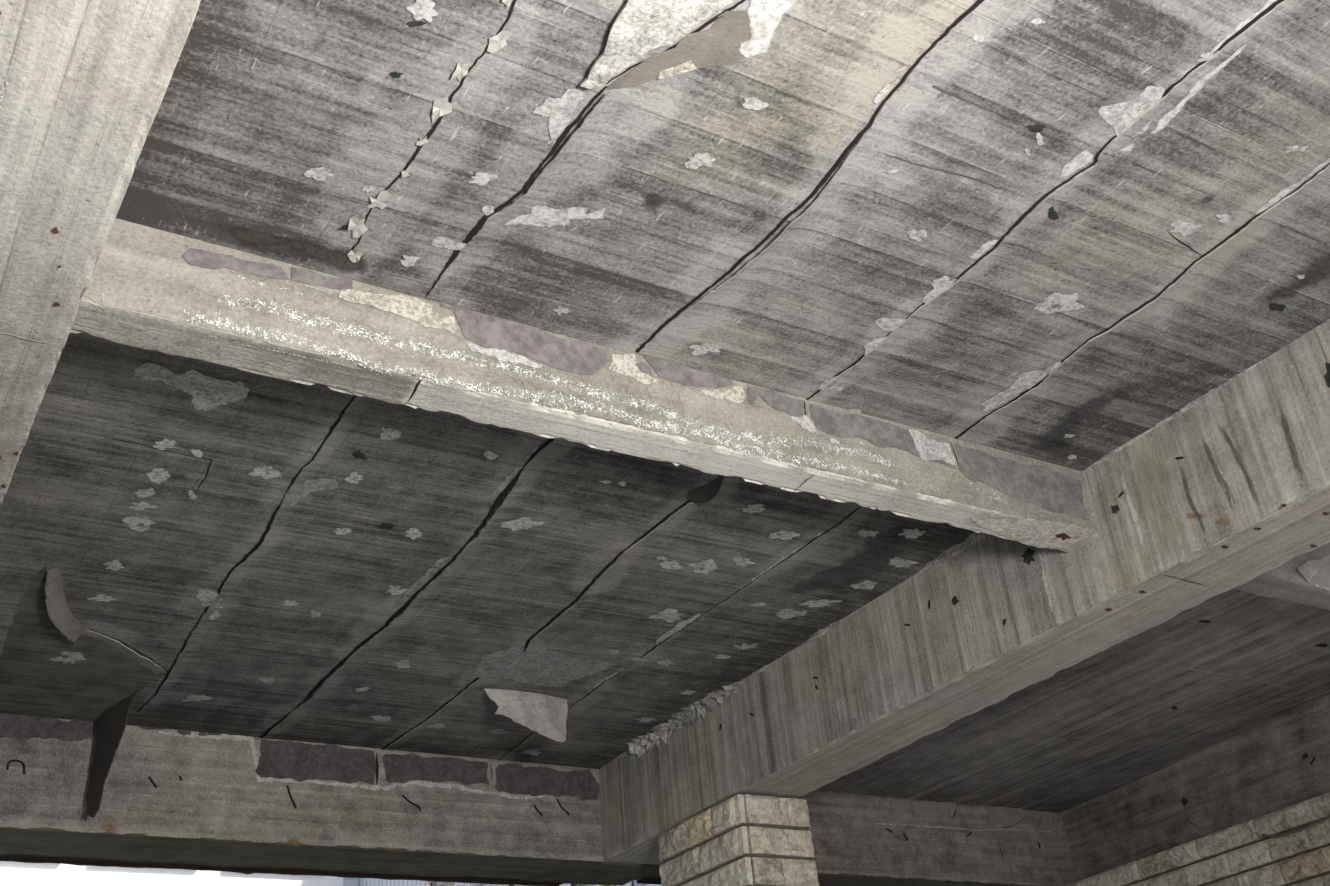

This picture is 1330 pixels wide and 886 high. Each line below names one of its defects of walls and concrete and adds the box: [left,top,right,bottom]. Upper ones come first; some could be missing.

peeling [132,363,250,411]
crack [343,0,517,265]
peeling [533,76,588,143]
crack [426,0,746,302]
peeling [182,248,1092,549]
spalling [605,0,793,90]
peeling [742,97,769,110]
crack [635,0,1313,415]
crack [951,162,1330,472]
crack [259,438,576,739]
crack [523,476,742,652]
peeling [256,739,600,801]